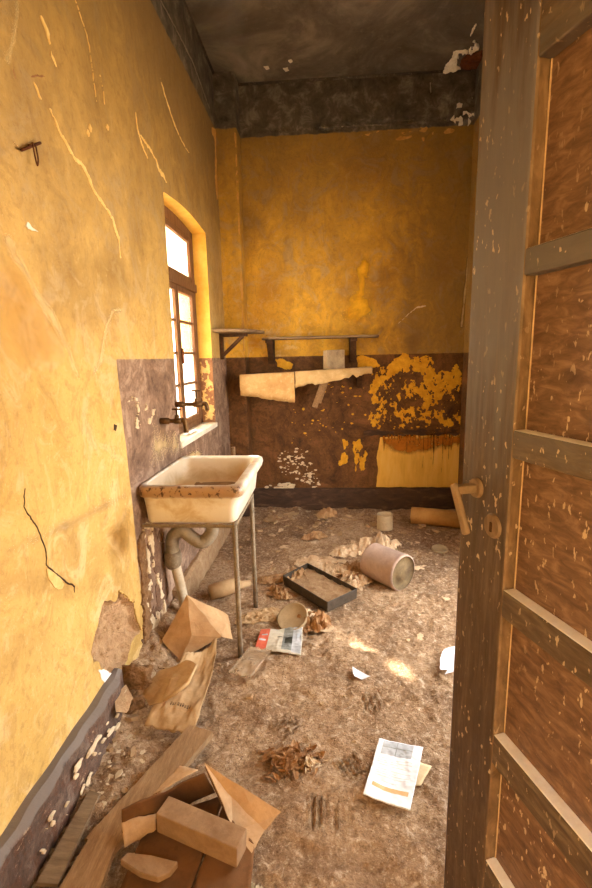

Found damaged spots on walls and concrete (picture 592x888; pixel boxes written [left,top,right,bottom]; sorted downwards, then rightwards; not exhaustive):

peeling [443,40,483,74]
crack [13,0,121,258]
crack [135,112,167,183]
crack [160,78,189,153]
peeling [396,102,474,141]
peeling [200,360,215,420]
peeling [304,353,462,472]
peeling [264,442,321,488]
crack [23,488,75,593]
spalling [91,522,169,683]
peeling [73,713,121,795]
peeling [45,801,70,829]